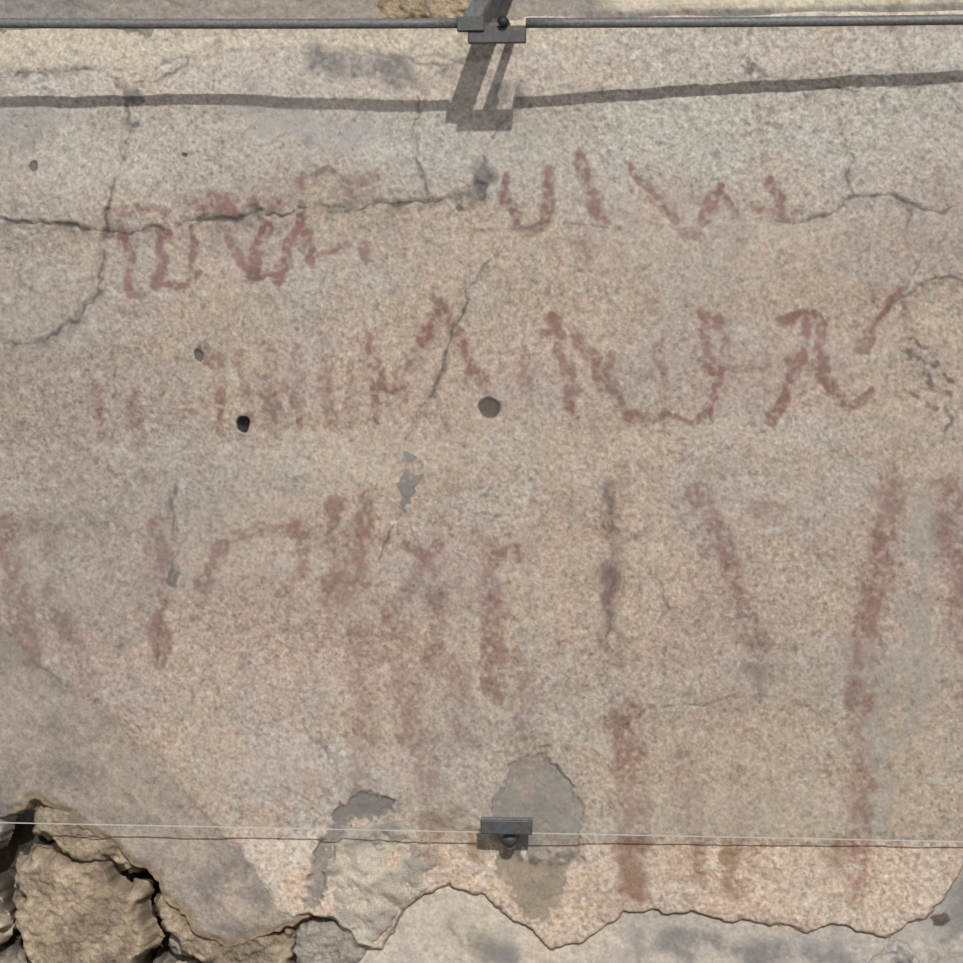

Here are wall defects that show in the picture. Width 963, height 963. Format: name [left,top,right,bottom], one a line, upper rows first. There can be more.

crack [198,206,307,222]
crack [376,197,452,207]
crack [776,194,949,223]
crack [4,214,126,343]
spalling [304,791,395,908]
peeling [931,913,950,926]
peeling [868,941,919,963]